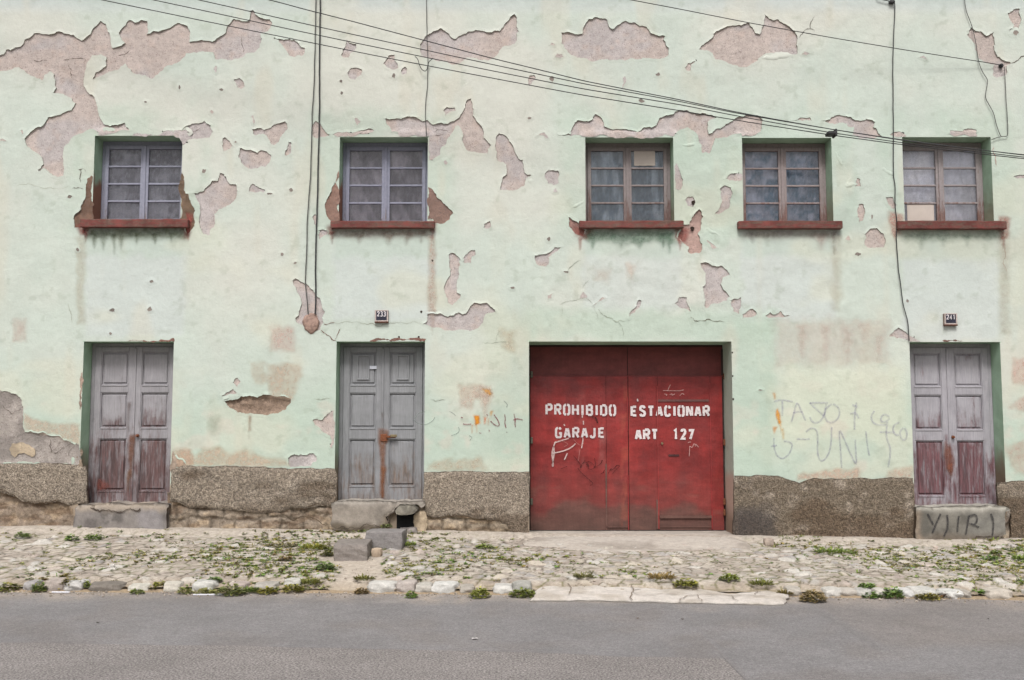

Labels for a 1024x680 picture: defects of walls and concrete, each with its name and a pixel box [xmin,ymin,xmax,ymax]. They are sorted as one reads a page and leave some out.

peeling [417,12,522,68]
peeling [548,14,672,79]
peeling [682,12,812,74]
peeling [964,6,1024,81]
peeling [0,7,308,238]
peeling [309,96,562,193]
peeling [525,107,765,157]
leakage [90,228,182,237]
peeling [672,163,793,321]
flaking render [0,387,83,467]
flaking render [219,375,294,418]
corrosion [379,430,388,496]